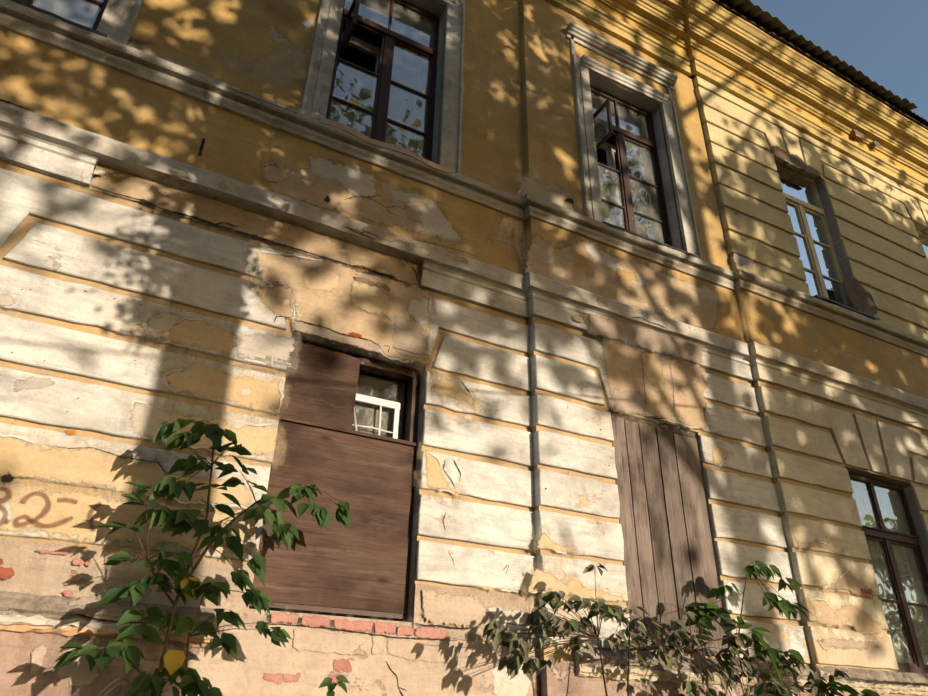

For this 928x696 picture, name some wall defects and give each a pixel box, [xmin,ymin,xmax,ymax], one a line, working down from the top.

flaking render [81,169,480,413]
crack [83,184,479,288]
peeling [262,155,465,245]
flaking render [514,220,718,330]
flaking render [572,313,707,429]
peeling [128,400,278,458]
peeling [0,433,258,595]
flaking render [62,590,159,623]
flaking render [150,676,187,696]
flaking render [187,569,624,696]